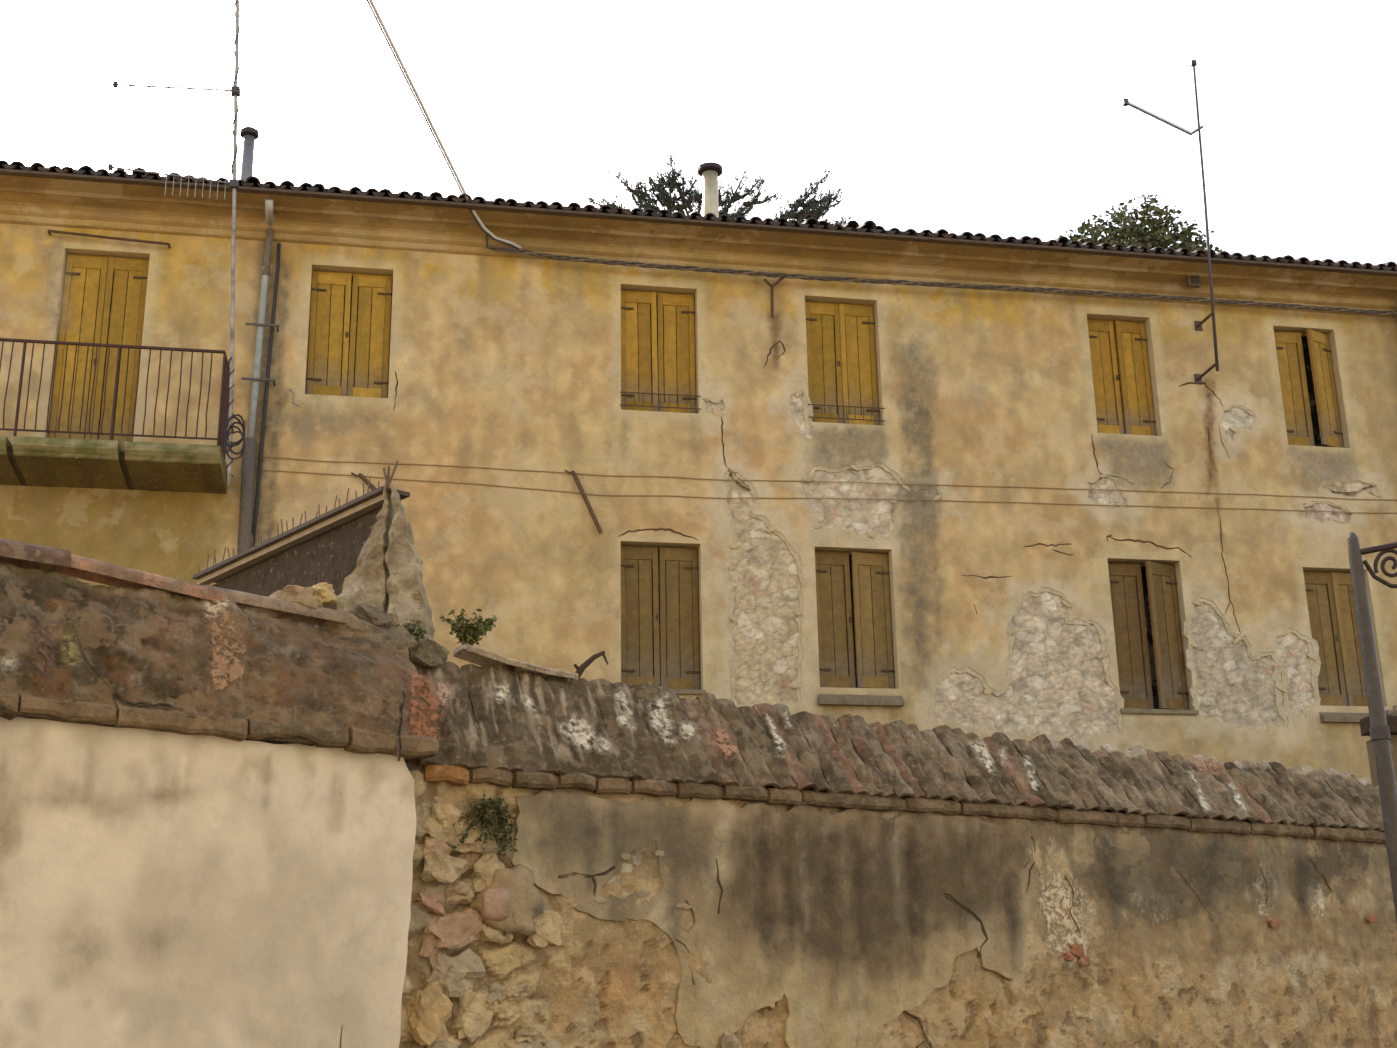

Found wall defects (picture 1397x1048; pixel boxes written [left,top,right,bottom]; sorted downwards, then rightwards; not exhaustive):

crack [721,419,751,491]
flaking render [800,463,942,541]
peeling [616,691,695,743]
flaking render [723,465,804,751]
flaking render [928,587,1124,772]
crack [1106,507,1248,648]
flaking render [1183,597,1321,731]
flaking render [404,803,564,1048]
crack [558,867,614,894]
damp [733,819,1002,970]
crack [944,893,987,958]
crack [902,1010,936,1048]